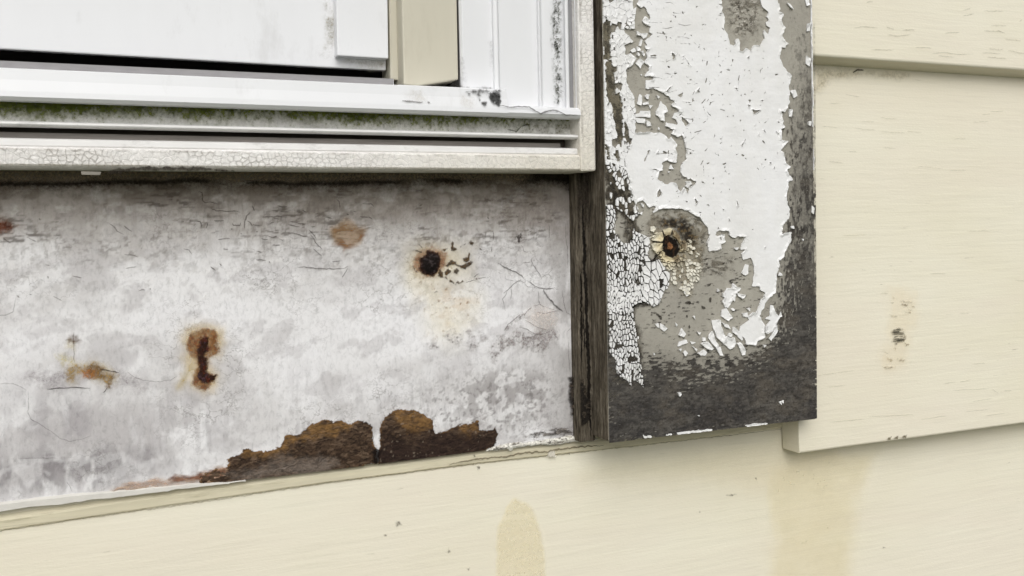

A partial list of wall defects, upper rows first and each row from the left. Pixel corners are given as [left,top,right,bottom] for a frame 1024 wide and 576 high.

water stain [450,80,501,106]
water stain [552,1,561,103]
peeling [805,0,814,127]
peeling [605,0,804,356]
rust [332,224,364,248]
rust [414,241,485,283]
rust [43,359,127,393]
rust [187,329,219,390]
peeling [0,409,498,512]